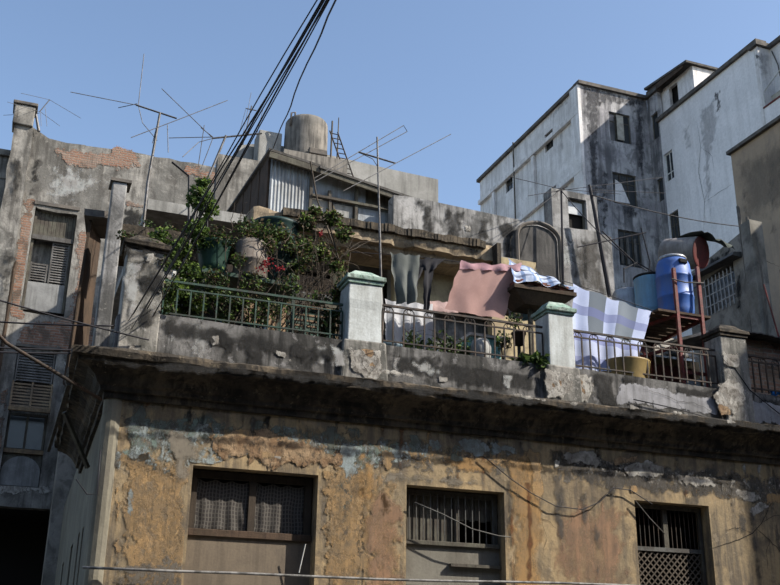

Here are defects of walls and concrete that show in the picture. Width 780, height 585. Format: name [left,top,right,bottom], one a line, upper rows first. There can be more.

flaking render [55,146,141,171]
leakage [584,89,643,227]
leakage [404,200,434,246]
leakage [445,209,492,246]
leakage [500,223,515,258]
leakage [157,319,380,388]
flaking render [332,347,414,379]
leakage [390,356,537,406]
flaking render [713,378,746,424]
flaking render [723,351,740,367]